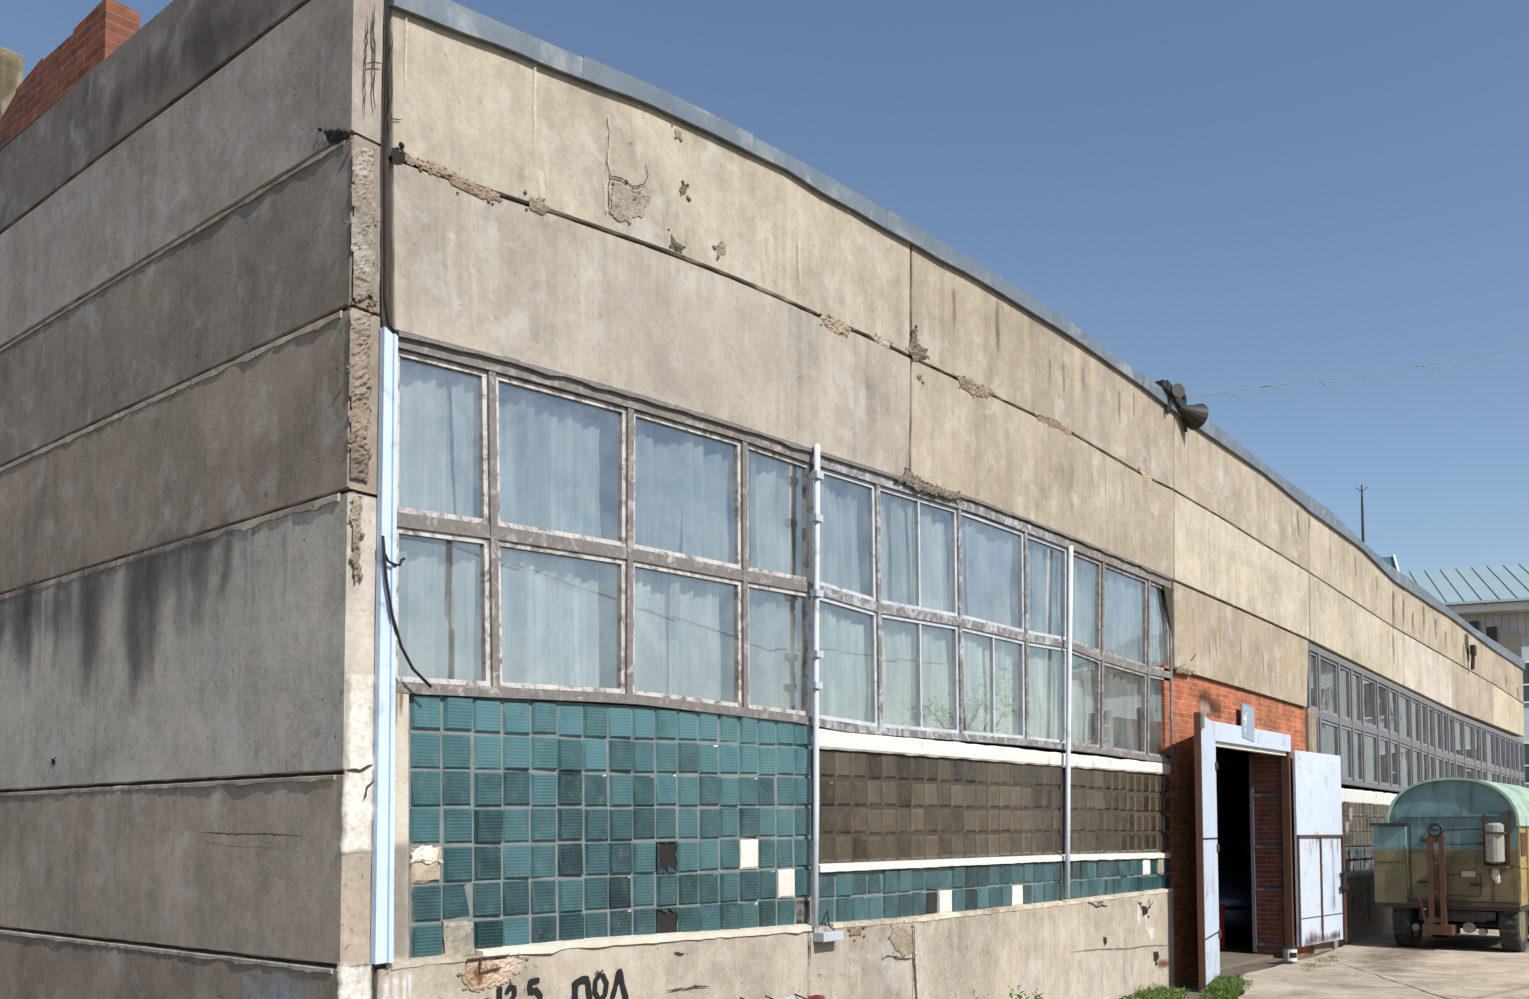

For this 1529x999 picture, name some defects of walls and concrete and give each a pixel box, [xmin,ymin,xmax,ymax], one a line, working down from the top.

crack [364,4,402,135]
spalling [524,190,556,216]
spalling [605,179,651,224]
spalling [318,127,501,582]
spalling [816,312,930,384]
spalling [952,372,998,398]
spalling [1035,414,1075,436]
peeling [342,676,374,852]
spalling [410,844,443,864]
spalling [888,920,916,956]
peeling [339,965,372,999]
spalling [457,953,529,992]